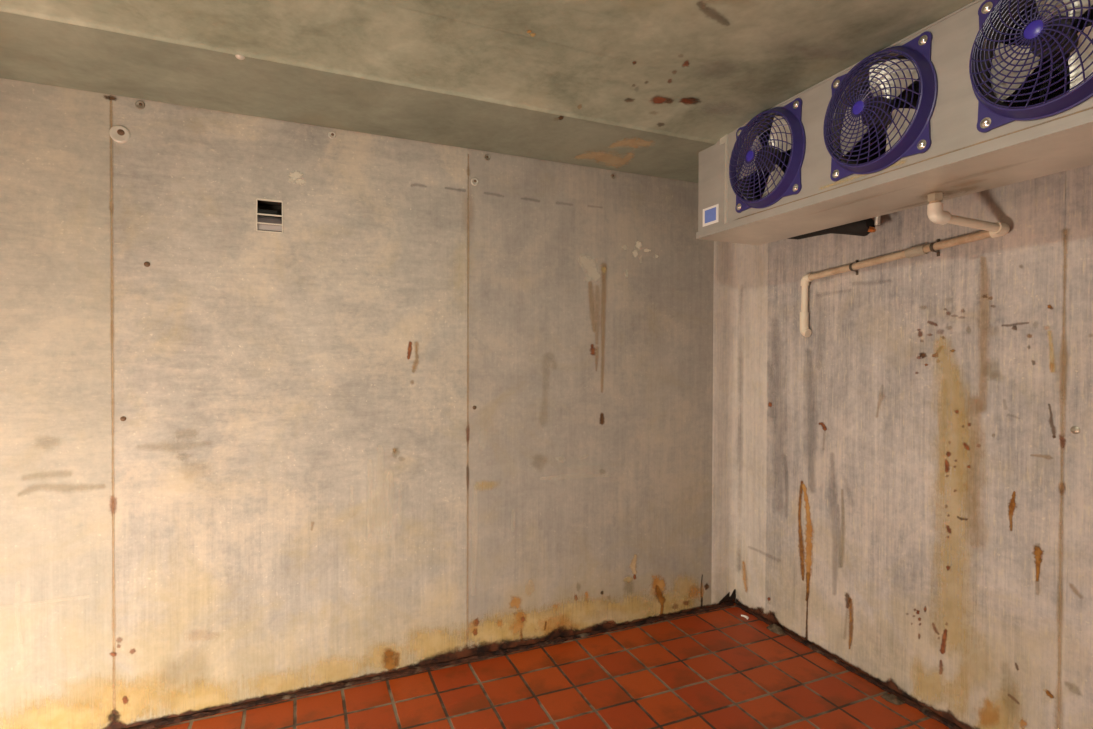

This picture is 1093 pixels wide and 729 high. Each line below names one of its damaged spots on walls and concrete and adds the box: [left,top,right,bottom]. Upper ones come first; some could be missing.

rust [104,96,974,729]
rust [1008,491,1016,531]
rust [1033,546,1043,581]
damp [370,579,700,668]
damp [0,684,149,729]
damp [171,681,228,713]
damp [260,674,304,695]
damp [316,661,357,683]